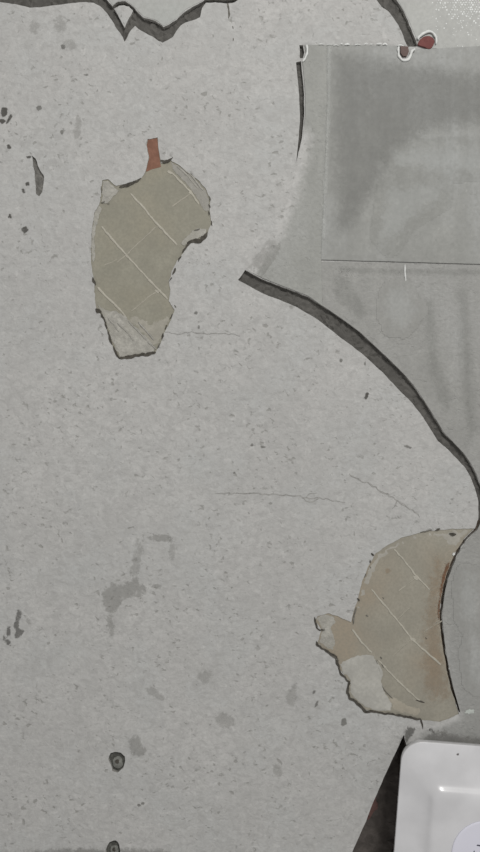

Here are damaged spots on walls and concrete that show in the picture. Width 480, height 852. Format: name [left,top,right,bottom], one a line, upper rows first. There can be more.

spalling [91,138,212,359]